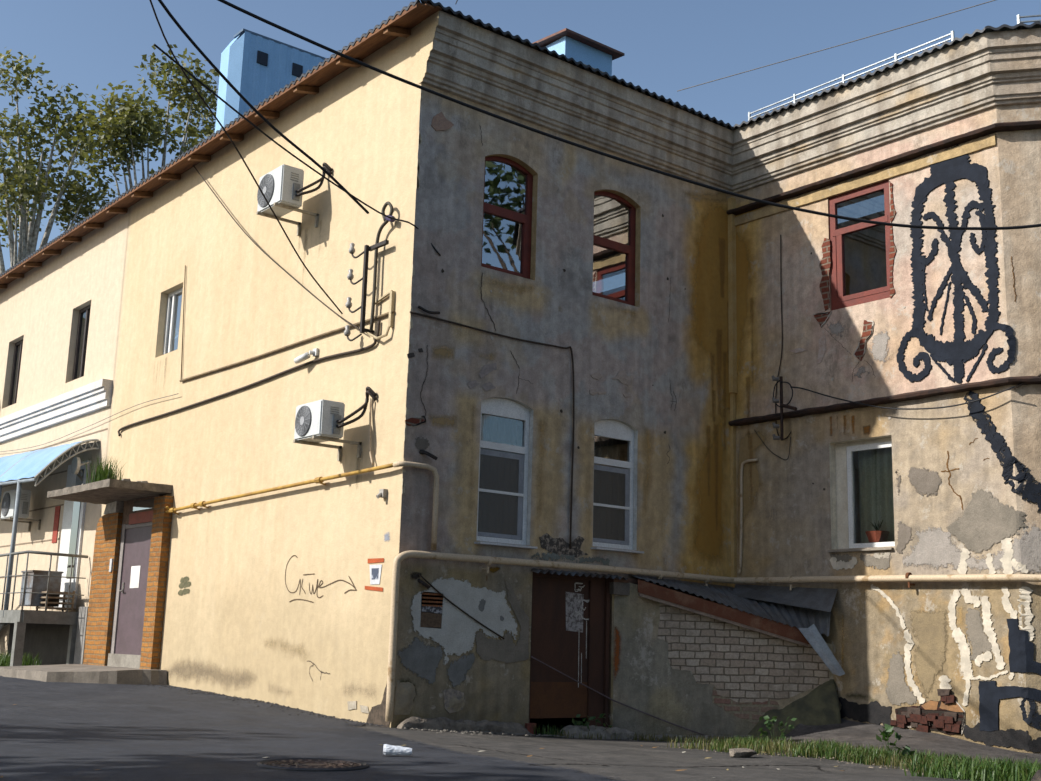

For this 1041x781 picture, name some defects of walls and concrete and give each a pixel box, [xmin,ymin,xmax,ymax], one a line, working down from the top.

spalling [810,238,832,327]
damp [694,206,753,559]
spalling [853,320,874,361]
damp [737,431,765,542]
flaking render [410,577,518,664]